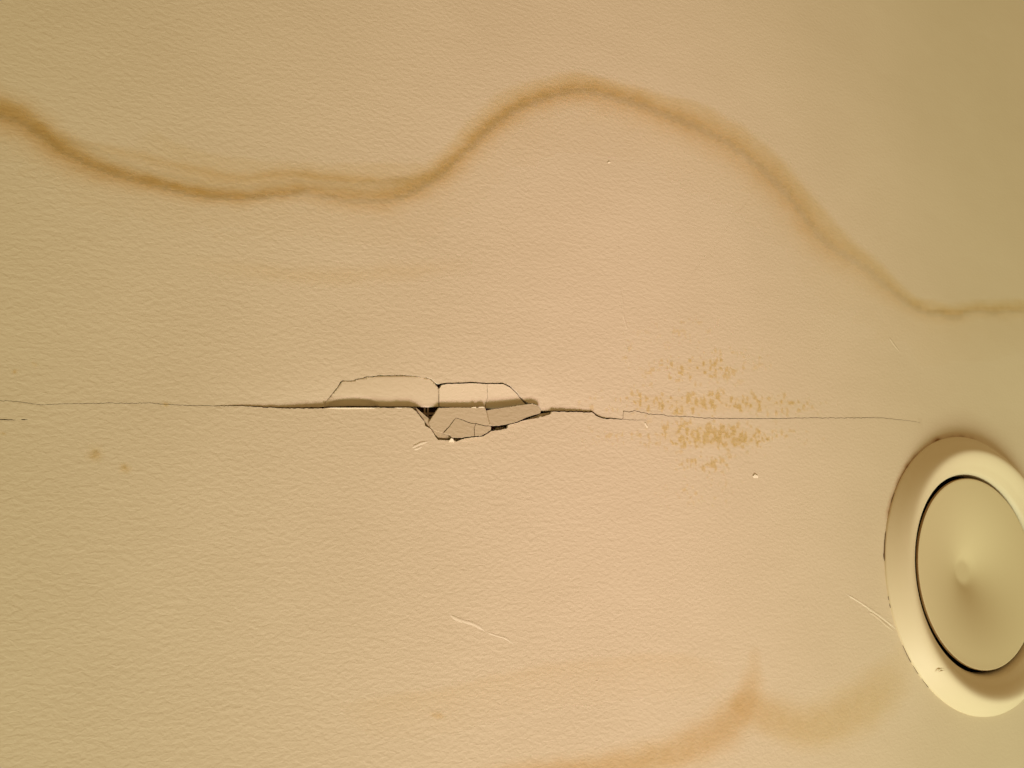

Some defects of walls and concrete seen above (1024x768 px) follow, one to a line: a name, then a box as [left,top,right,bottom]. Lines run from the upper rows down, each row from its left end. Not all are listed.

water stain [0,102,305,201]
water stain [375,85,696,200]
crack [0,400,323,420]
flaking render [322,375,552,450]
water stain [634,393,769,447]
crack [552,410,915,422]